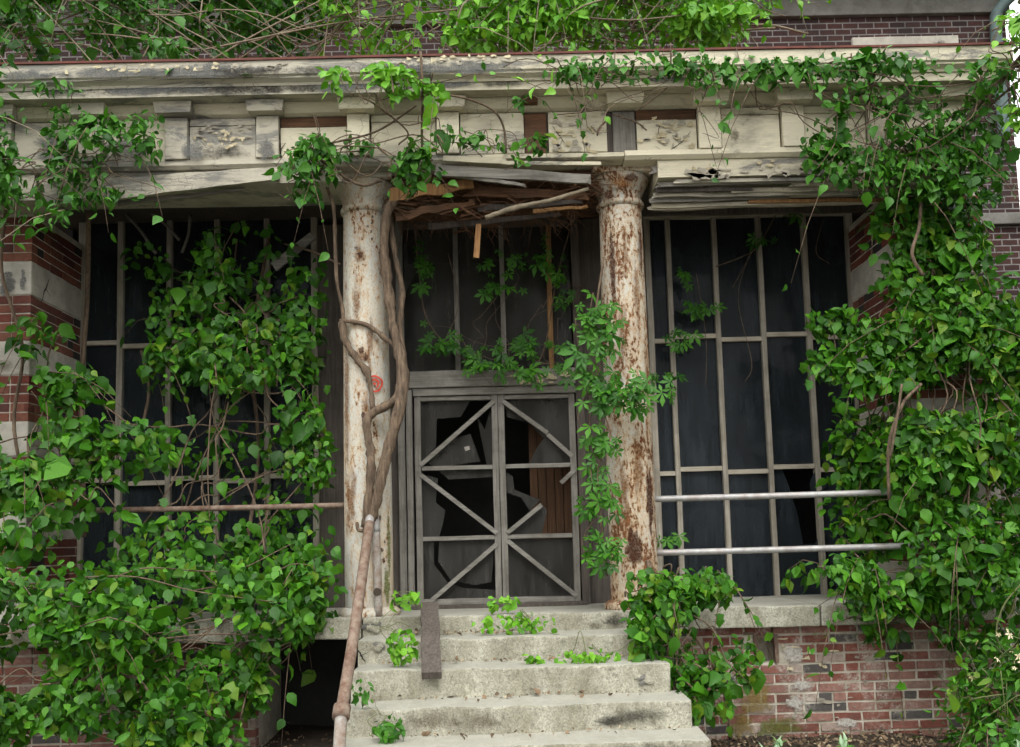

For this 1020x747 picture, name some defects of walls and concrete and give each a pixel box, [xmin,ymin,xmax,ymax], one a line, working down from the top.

peeling [402,54,517,65]
peeling [192,124,253,149]
peeling [549,114,605,154]
peeling [636,116,695,148]
corrosion [604,173,638,198]
corrosion [610,226,642,349]
corrosion [347,475,356,528]
corrosion [620,433,653,567]
damp [784,645,803,664]
damp [786,681,810,711]
damp [837,718,857,727]